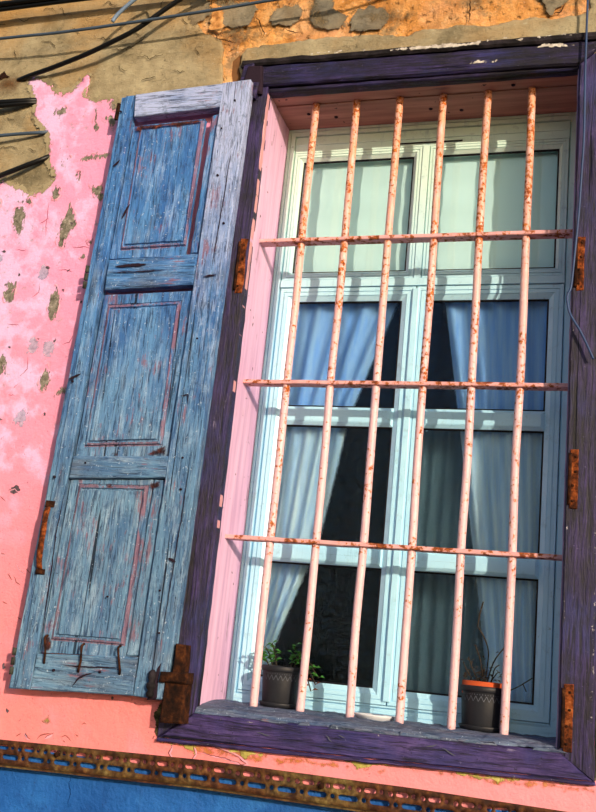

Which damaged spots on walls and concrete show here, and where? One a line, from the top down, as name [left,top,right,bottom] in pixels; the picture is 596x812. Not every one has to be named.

spalling [188,0,591,83]
peeling [0,73,121,234]
peeling [55,202,77,249]
peeling [2,273,20,303]
peeling [46,284,64,321]
peeling [0,346,11,375]
peeling [37,363,66,396]